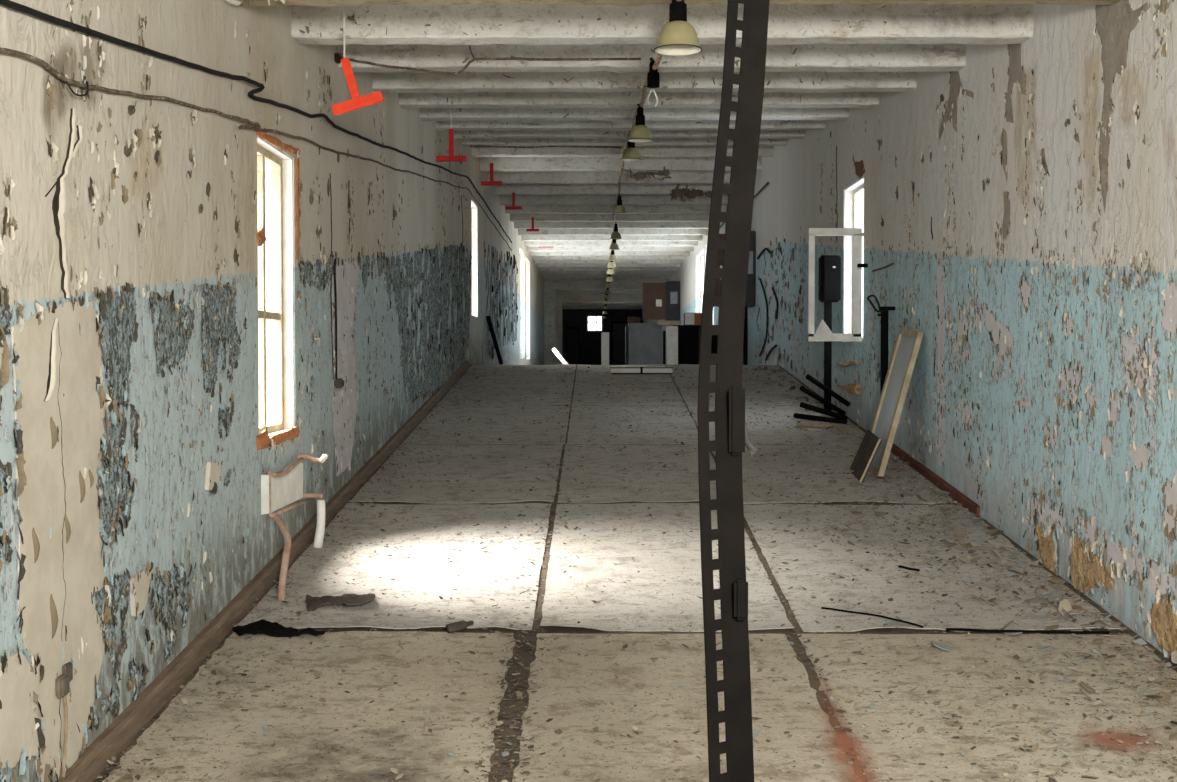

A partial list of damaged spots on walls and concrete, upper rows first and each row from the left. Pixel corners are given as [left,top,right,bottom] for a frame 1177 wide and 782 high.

spalling [0,177,18,257]
spalling [46,0,162,252]
spalling [164,135,258,308]
peeling [305,62,332,130]
peeling [0,264,119,782]
crack [44,108,83,637]
peeling [126,562,154,641]
peeling [162,351,223,636]